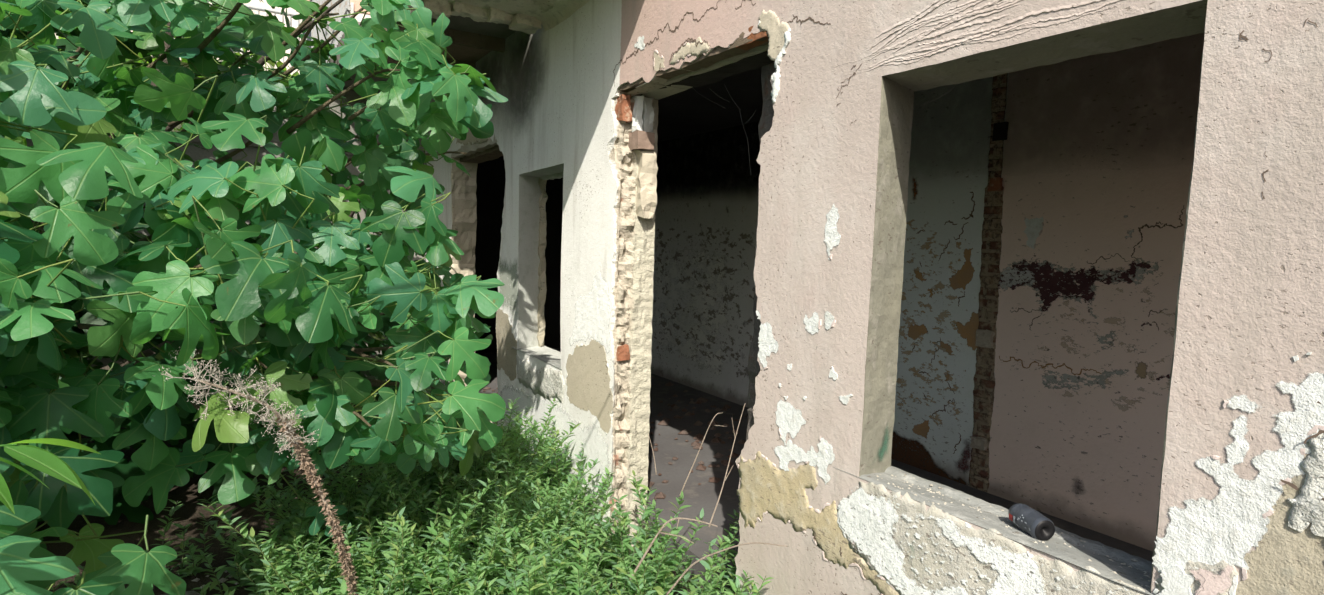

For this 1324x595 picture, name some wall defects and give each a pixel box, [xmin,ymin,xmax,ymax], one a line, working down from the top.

spalling [635,36,711,71]
crack [613,0,756,87]
spalling [757,10,791,103]
crack [787,15,831,26]
peeling [824,203,841,260]
spalling [896,73,1177,492]
spalling [495,308,613,434]
spalling [652,227,1324,595]